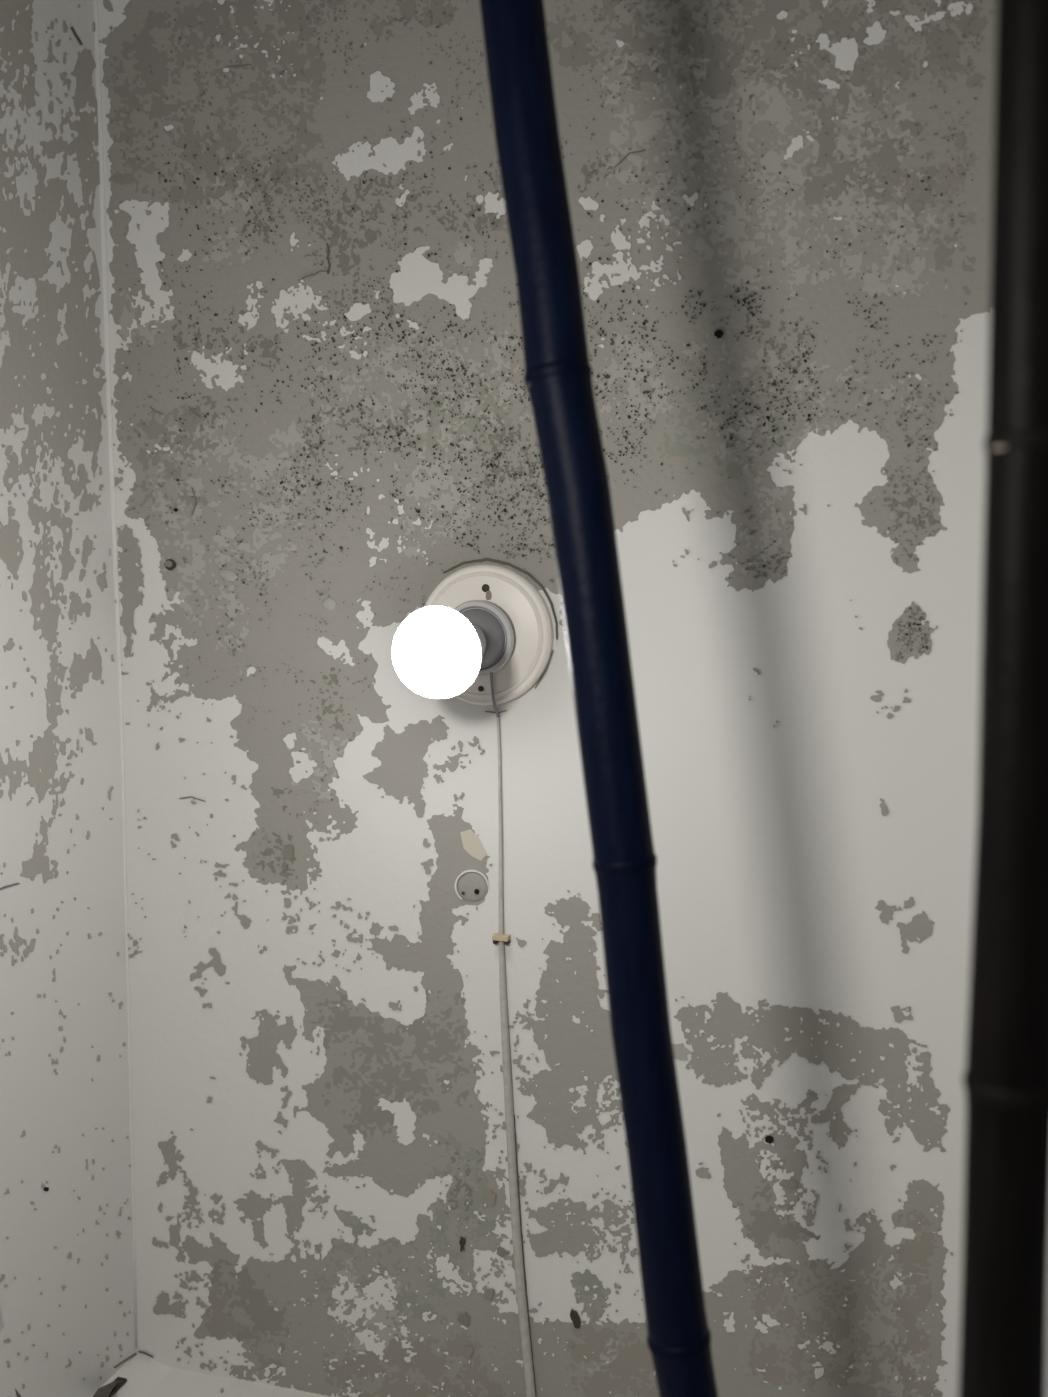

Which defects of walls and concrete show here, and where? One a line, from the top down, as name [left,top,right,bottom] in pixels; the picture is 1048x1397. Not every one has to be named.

peeling [543,0,997,592]
peeling [0,0,648,1397]
peeling [875,897,935,954]
peeling [887,601,938,664]